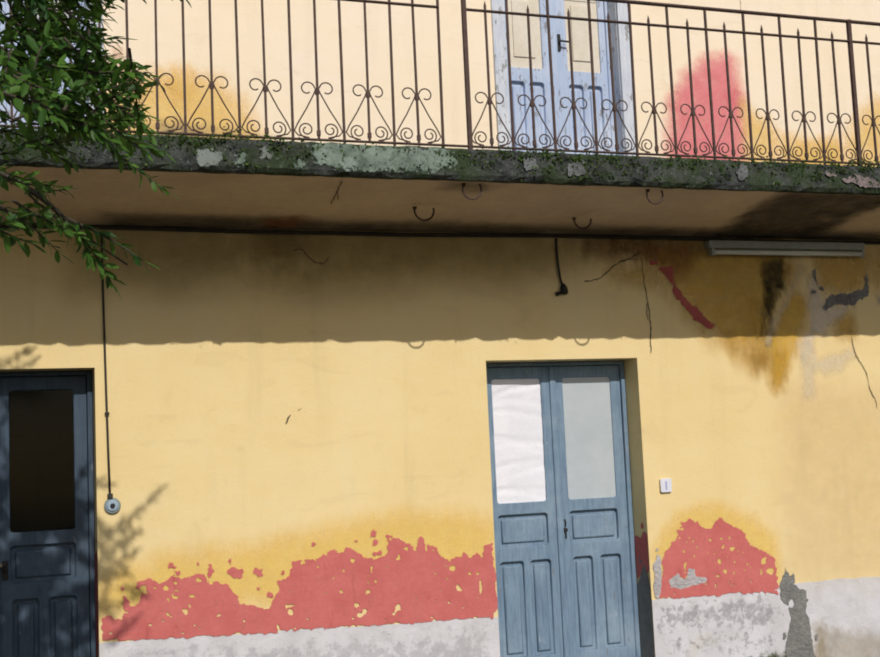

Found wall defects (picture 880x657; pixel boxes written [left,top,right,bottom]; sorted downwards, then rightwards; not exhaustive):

damp [436,194,880,241]
crack [584,251,652,351]
peeling [649,260,716,329]
damp [656,247,862,397]
flaking render [811,268,869,311]
crack [849,328,877,407]
peeling [95,530,498,657]
peeling [635,517,818,657]